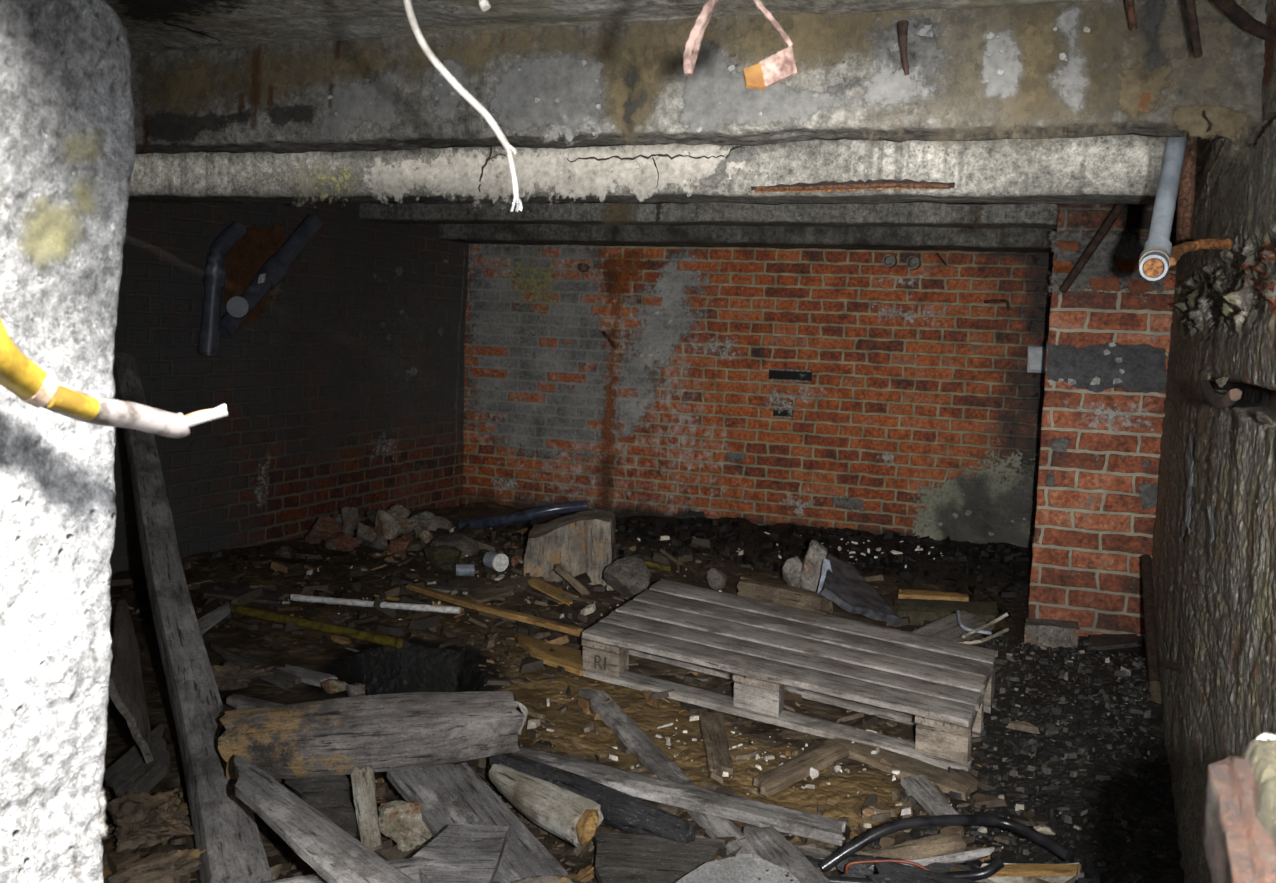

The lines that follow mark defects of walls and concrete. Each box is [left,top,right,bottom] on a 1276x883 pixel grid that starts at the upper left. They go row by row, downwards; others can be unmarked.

water stain [118,0,244,29]
water stain [144,10,919,145]
water stain [930,0,1257,138]
crack [567,145,743,189]
spalling [1192,240,1276,326]
rust [596,250,650,509]
spalling [1209,376,1276,425]
water stain [938,465,1039,548]